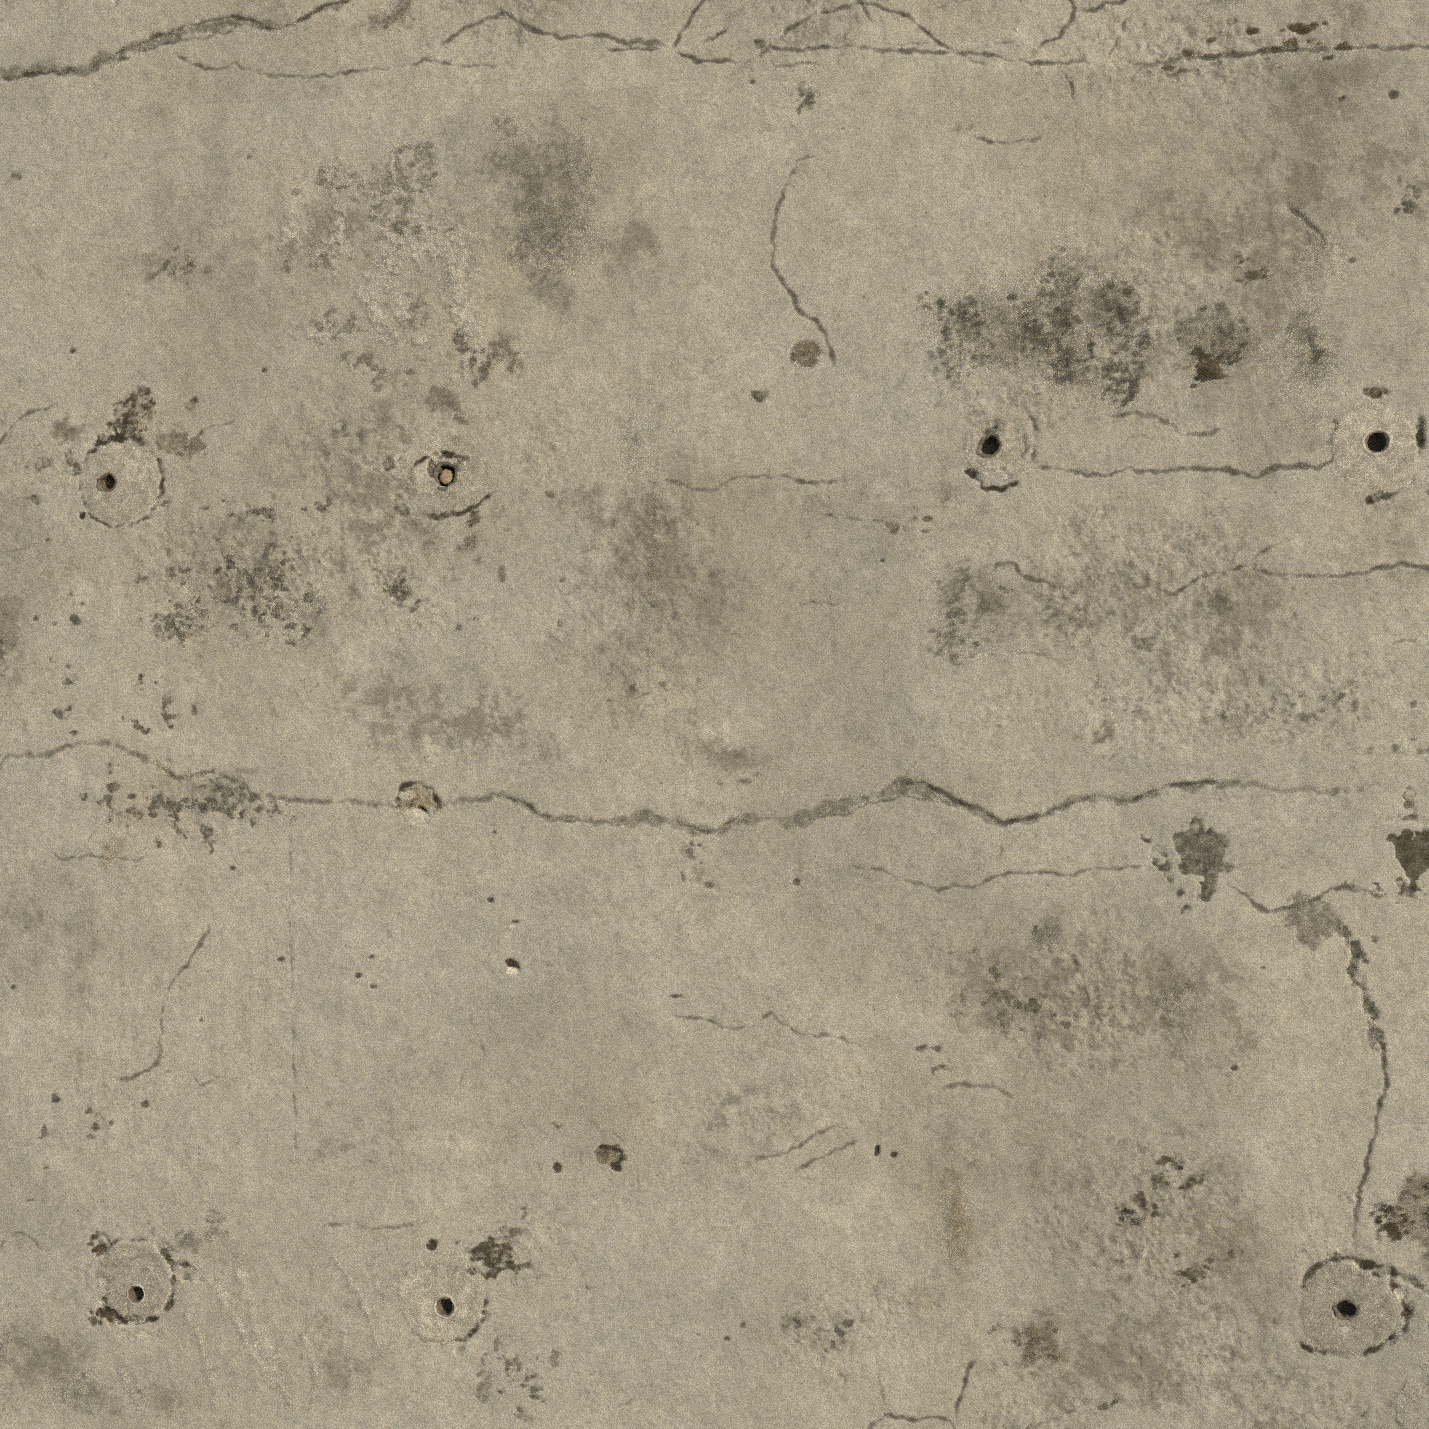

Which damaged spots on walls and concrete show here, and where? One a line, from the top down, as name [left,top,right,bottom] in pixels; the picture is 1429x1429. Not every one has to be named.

crack [3,1,346,81]
crack [422,0,730,64]
crack [767,1,995,57]
leakage [929,333,989,383]
leakage [1020,282,1151,408]
crack [1073,433,1325,478]
hole [396,782,441,830]
crack [461,777,1264,835]
peeling [1140,817,1231,914]
spalling [1374,787,1429,904]
peeling [1286,891,1341,950]
crack [1244,885,1389,1217]